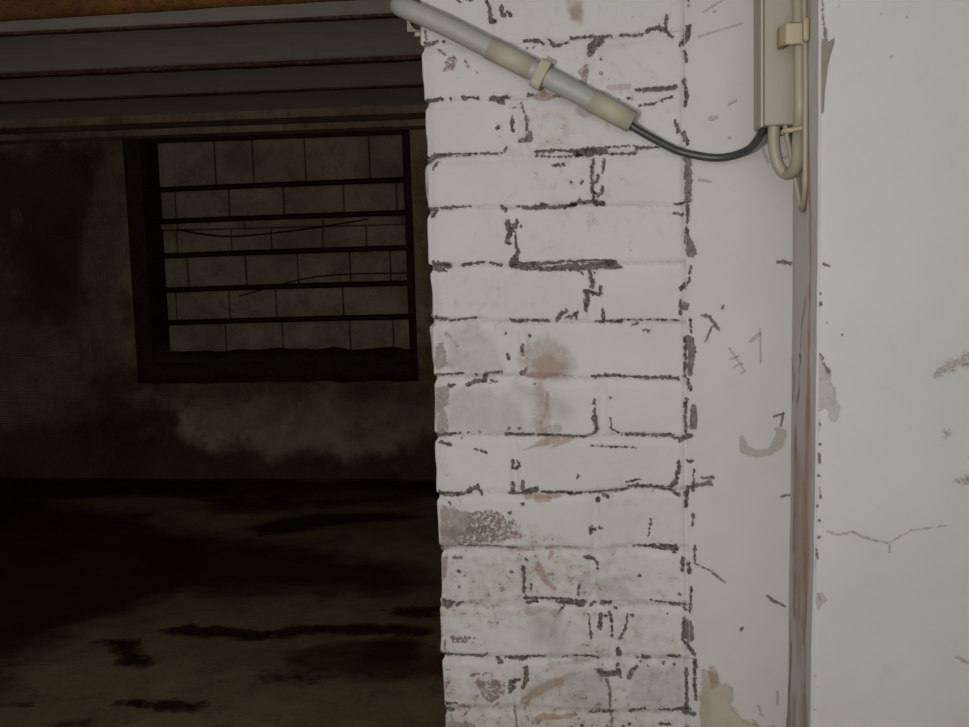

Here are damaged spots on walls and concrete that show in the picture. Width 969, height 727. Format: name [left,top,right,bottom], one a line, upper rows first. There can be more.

damp [421,345,437,398]
rust [793,305,809,641]
damp [0,393,439,656]
damp [104,639,154,667]
damp [160,607,445,683]
damp [114,699,204,712]
peeling [700,670,756,727]